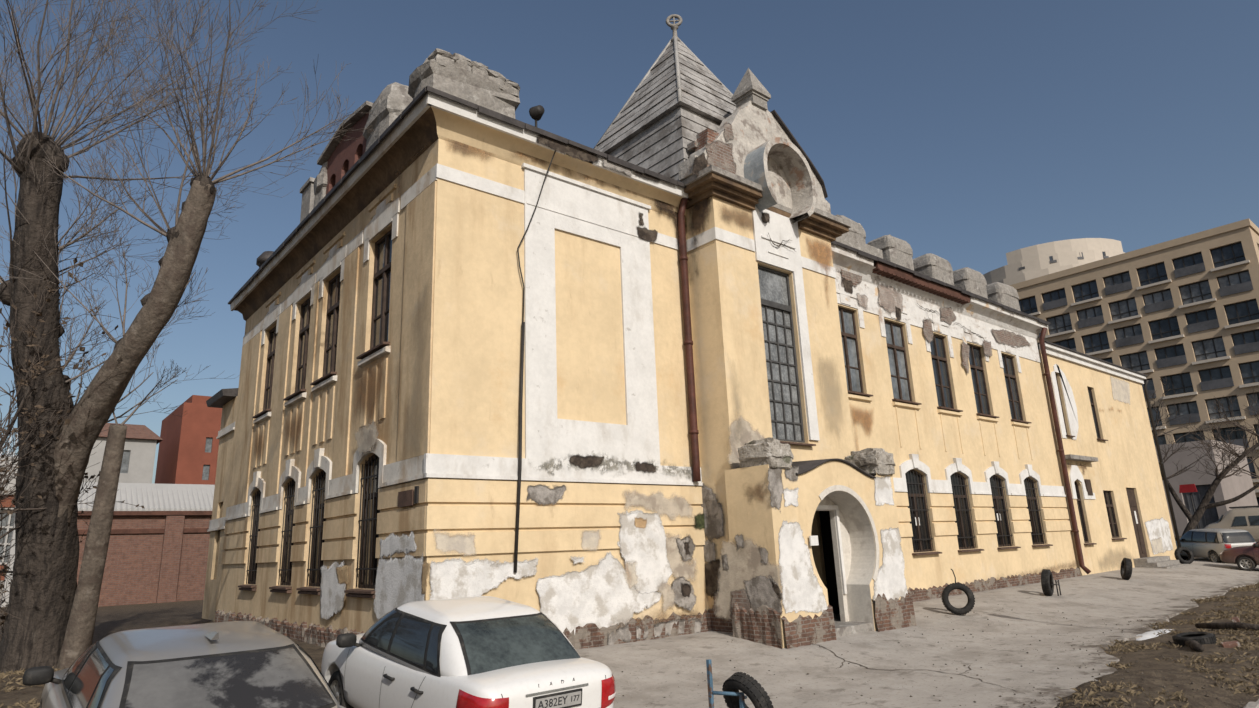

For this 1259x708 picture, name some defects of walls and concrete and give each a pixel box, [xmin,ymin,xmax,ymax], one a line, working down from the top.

spalling [693,123,736,176]
spalling [841,269,903,320]
spalling [923,307,956,342]
spalling [961,329,1031,373]
spalling [729,417,765,469]
peeling [374,466,827,645]
peeling [872,528,908,604]
peeling [1145,517,1173,555]